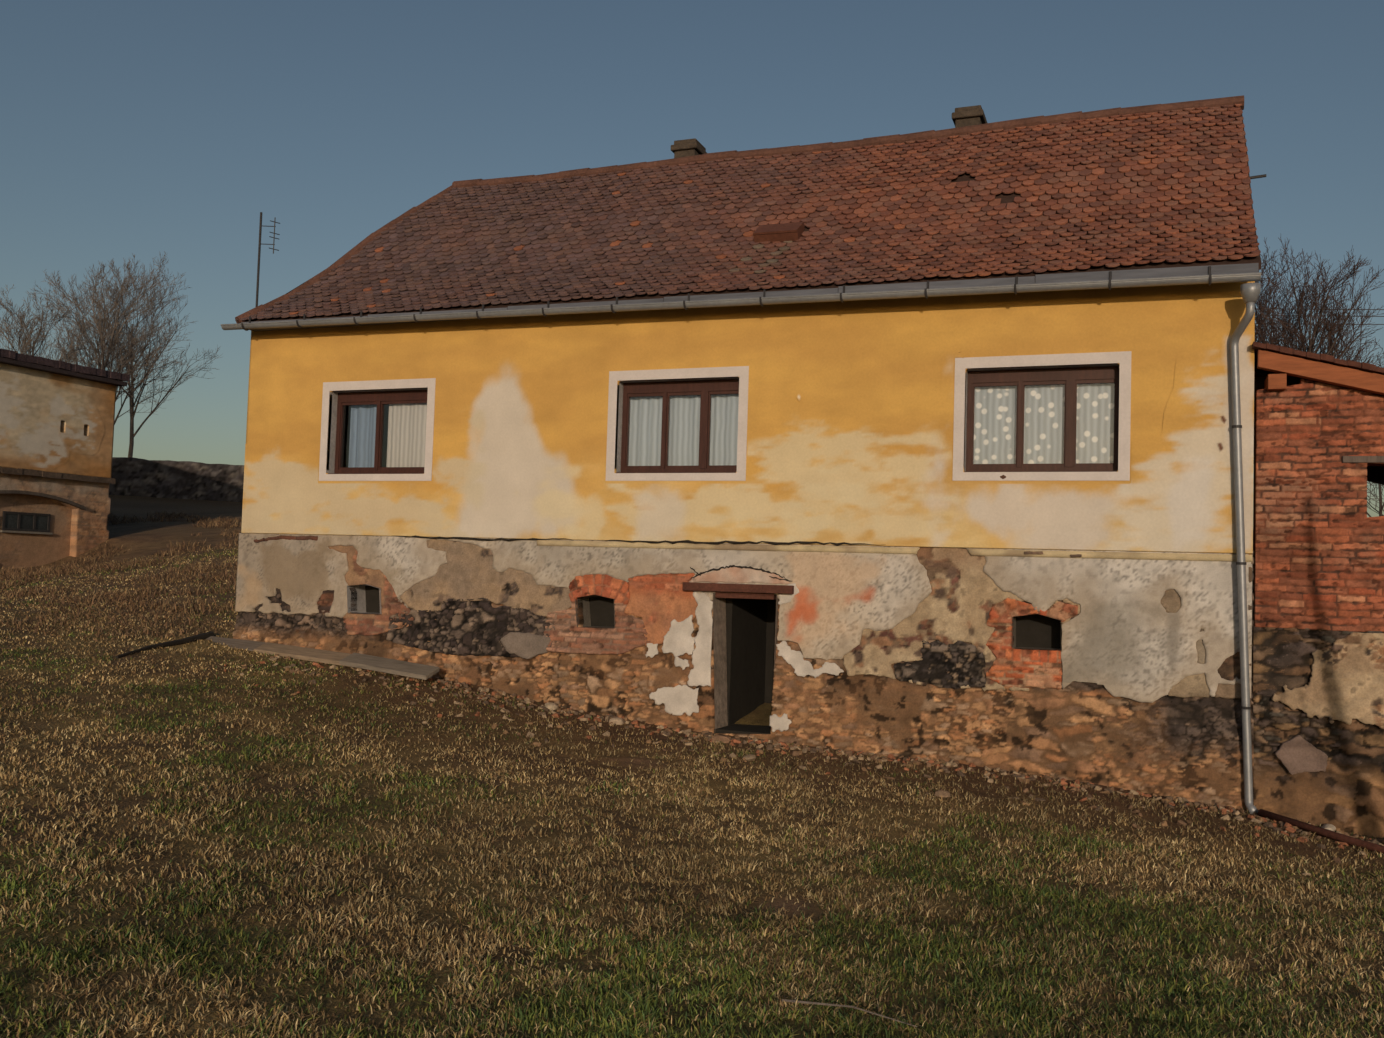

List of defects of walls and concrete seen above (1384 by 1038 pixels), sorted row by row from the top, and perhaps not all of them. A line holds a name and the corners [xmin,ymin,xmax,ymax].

peeling [0,366,105,469]
peeling [241,326,1255,716]
peeling [769,713,792,732]
flaking render [1271,632,1384,729]